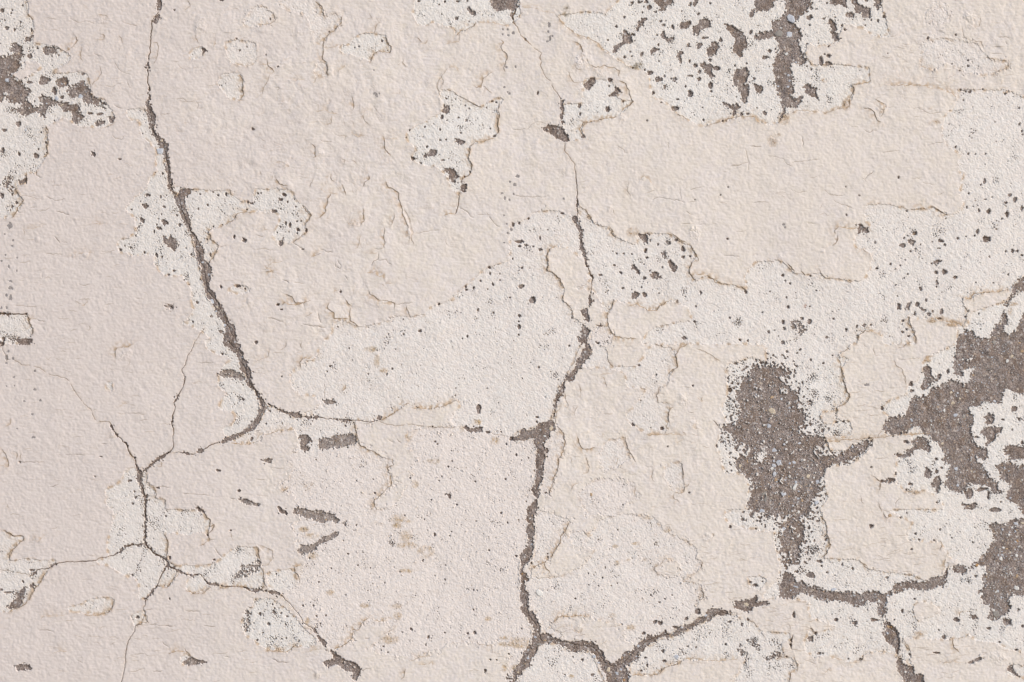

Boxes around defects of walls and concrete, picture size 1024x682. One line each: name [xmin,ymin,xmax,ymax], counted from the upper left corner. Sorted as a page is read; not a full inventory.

peeling [0,0,115,219]
crack [0,0,454,682]
peeling [384,40,507,199]
peeling [97,84,1024,682]
crack [471,9,871,682]
peeling [541,0,890,142]